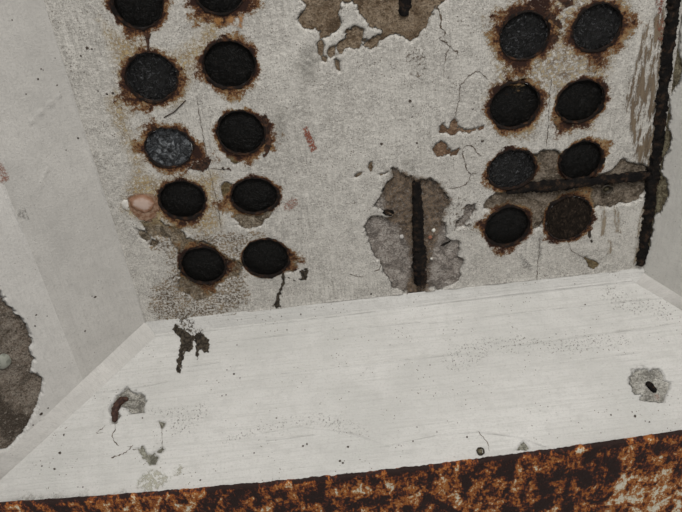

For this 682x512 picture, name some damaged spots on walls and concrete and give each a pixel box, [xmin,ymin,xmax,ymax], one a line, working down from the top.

rust [103,0,296,229]
spalling [299,0,445,70]
crack [434,5,458,74]
crack [452,145,481,189]
rust [480,0,647,193]
spalling [484,0,665,229]
rust [277,241,306,276]
rust [381,170,452,294]
spalling [364,167,476,293]
spalling [0,298,42,449]
leakage [172,317,210,373]
spalling [630,369,669,403]